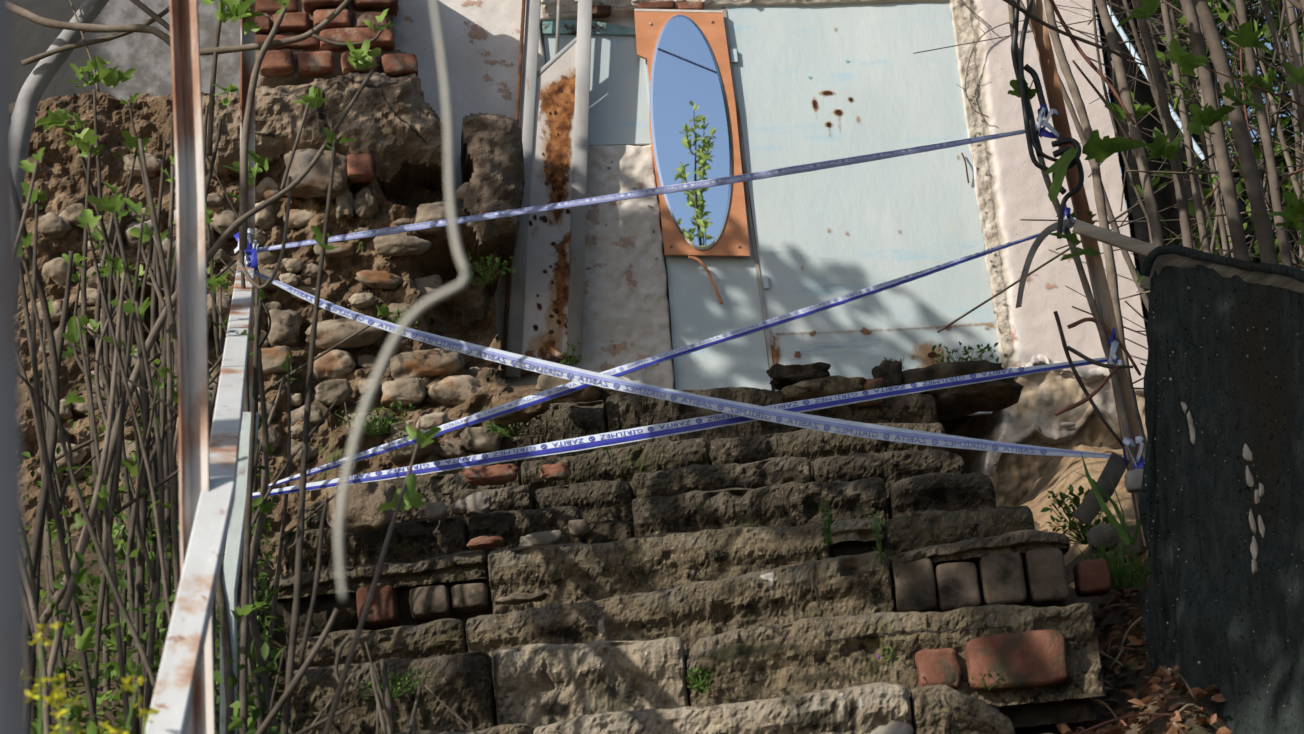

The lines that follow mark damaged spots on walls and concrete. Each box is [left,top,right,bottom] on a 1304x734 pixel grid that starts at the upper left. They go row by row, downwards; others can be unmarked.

peeling [465,22,513,100]
corrosion [812,91,859,127]
corrosion [525,72,576,360]